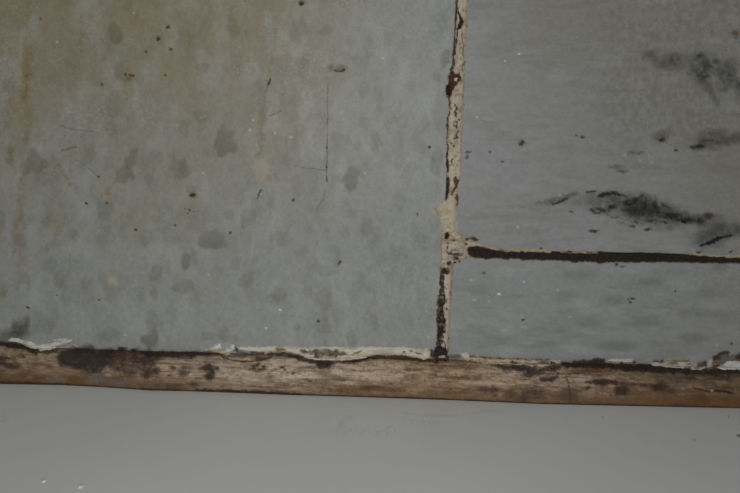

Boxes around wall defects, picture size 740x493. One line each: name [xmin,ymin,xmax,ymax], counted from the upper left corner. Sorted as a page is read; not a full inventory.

leakage [586,190,710,231]
peeling [8,338,82,351]
leakage [0,326,219,380]
leakage [236,348,370,370]
peeling [202,344,431,361]
peeling [651,359,740,370]
leakage [497,358,740,395]